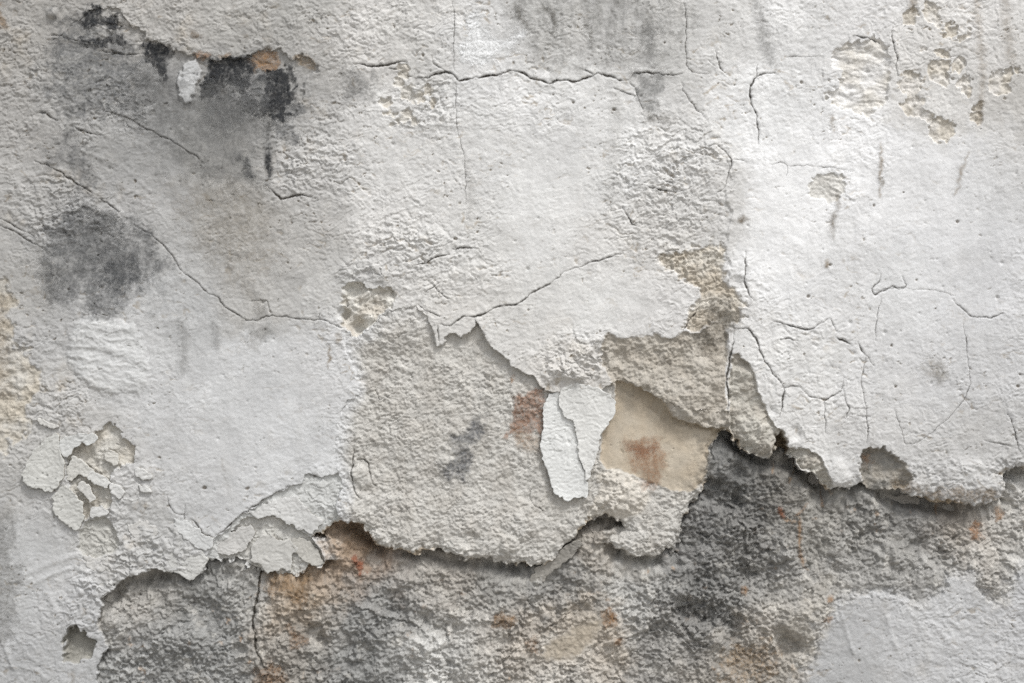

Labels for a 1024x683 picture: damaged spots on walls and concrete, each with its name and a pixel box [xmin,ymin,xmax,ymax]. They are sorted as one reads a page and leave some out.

water stain [54,18,268,171]
crack [425,12,696,109]
spalling [823,0,1022,144]
water stain [47,211,162,319]
crack [420,247,557,335]
spalling [0,239,1024,683]
corrosion [506,390,543,435]
crack [726,329,790,407]